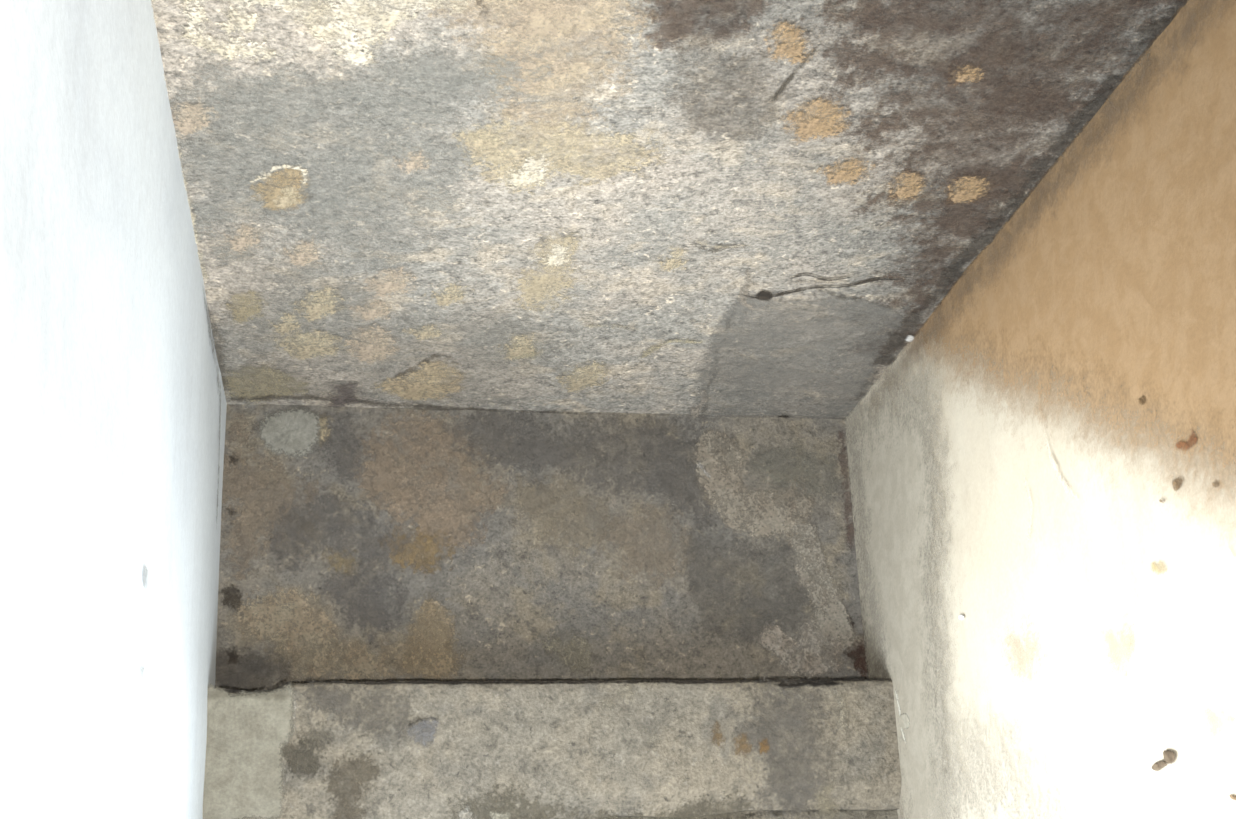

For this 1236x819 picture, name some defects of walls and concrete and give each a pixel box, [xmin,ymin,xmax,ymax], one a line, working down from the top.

water stain [645,0,769,51]
crack [691,242,895,417]
crack [219,678,889,694]